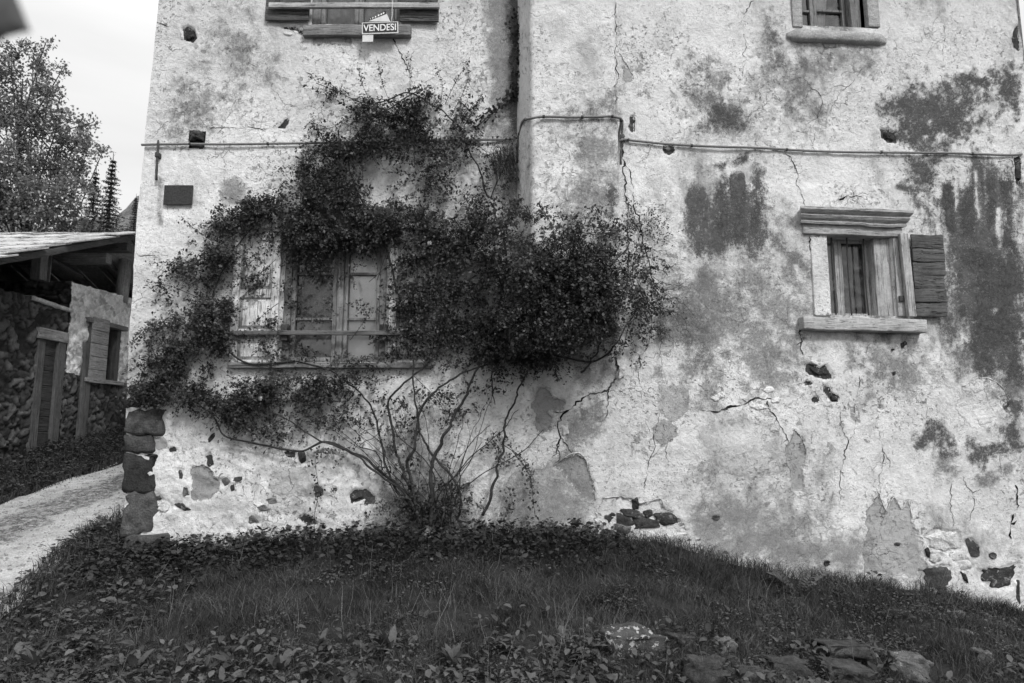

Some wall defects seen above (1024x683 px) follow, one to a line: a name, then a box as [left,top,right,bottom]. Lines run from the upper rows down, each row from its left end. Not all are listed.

crack [608,5,619,101]
water stain [693,65,748,140]
water stain [658,152,823,409]
water stain [875,61,1024,470]
flaking render [527,384,566,434]
crack [555,359,641,461]
crack [702,386,792,465]
spalling [804,360,839,403]
flaking render [156,455,242,513]
flaking render [553,452,688,538]
flaking render [863,492,1020,602]